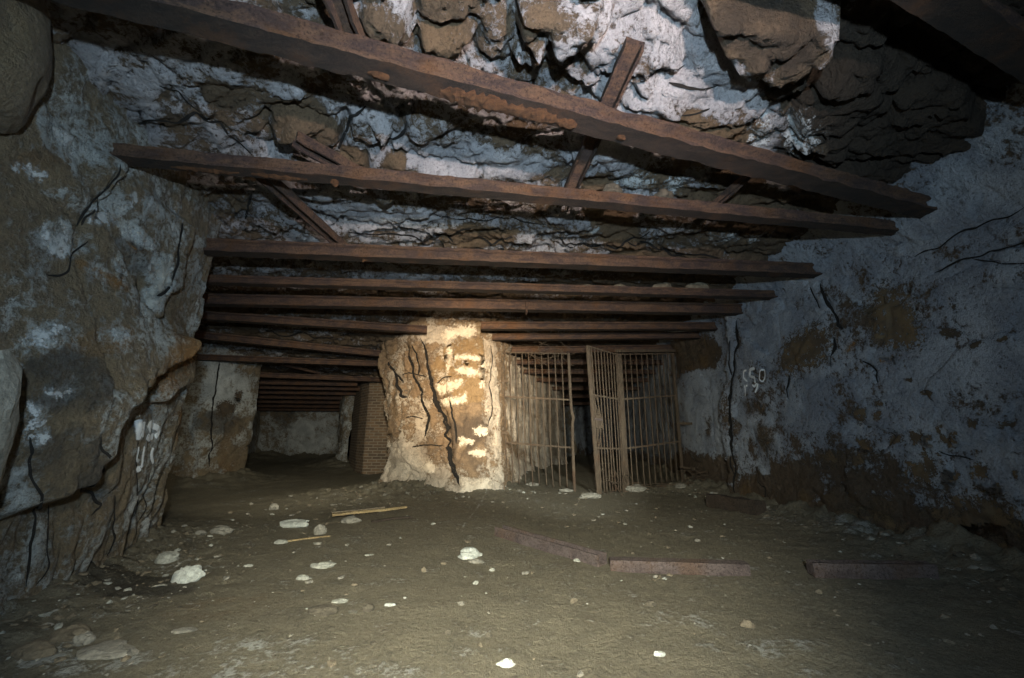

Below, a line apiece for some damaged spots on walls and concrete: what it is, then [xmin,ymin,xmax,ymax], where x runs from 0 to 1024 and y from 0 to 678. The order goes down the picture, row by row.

crack [338,106,366,149]
crack [387,122,407,140]
crack [48,164,121,277]
crack [349,213,718,258]
crack [914,208,1024,273]
crack [208,362,220,466]
crack [263,325,460,486]
crack [486,345,494,424]
crack [728,320,766,497]
crack [26,437,50,586]
crack [80,436,150,557]